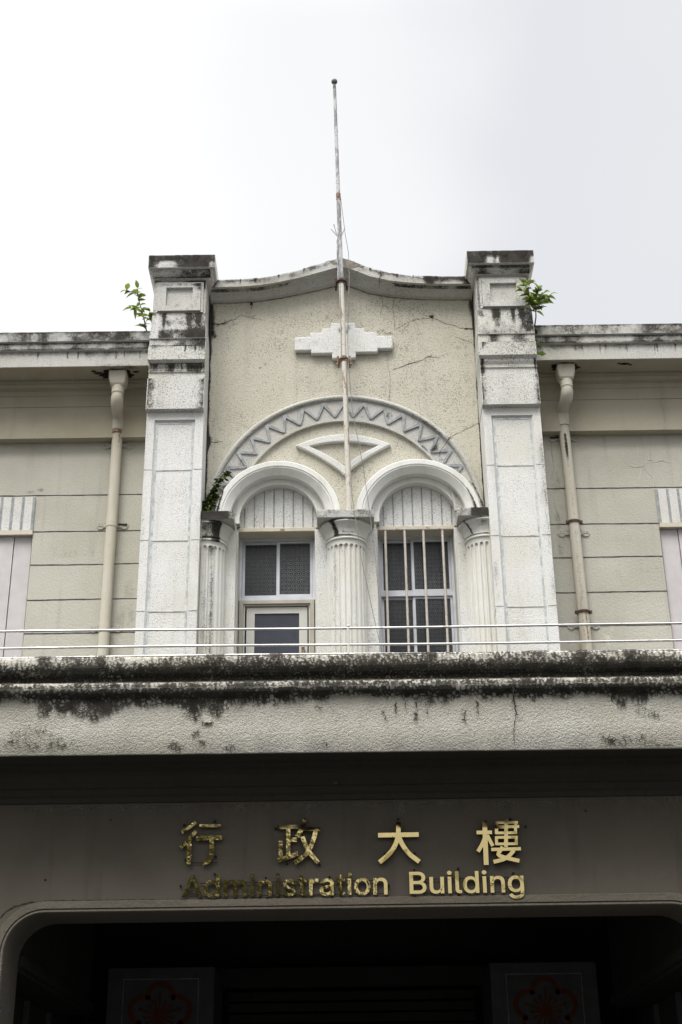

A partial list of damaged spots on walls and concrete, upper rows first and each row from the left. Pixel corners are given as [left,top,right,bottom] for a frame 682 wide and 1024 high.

crack [358,269,471,413]
leakage [0,250,682,750]
crack [510,682,518,743]